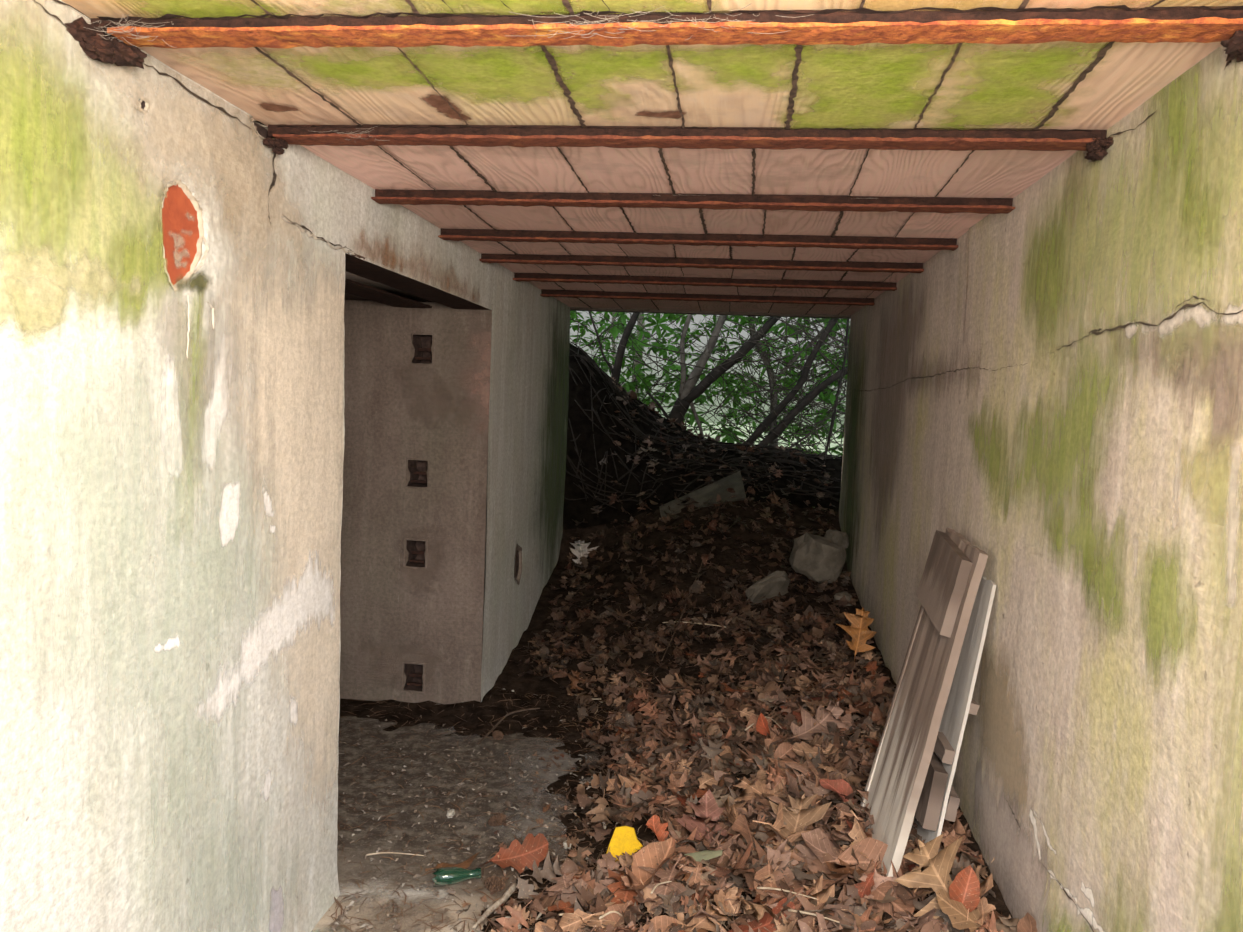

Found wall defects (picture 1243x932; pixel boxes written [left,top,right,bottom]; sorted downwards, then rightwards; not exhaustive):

damp [0,247,116,338]
crack [855,296,1243,391]
damp [1152,315,1243,603]
damp [974,648,1050,932]
crack [1041,863,1094,932]